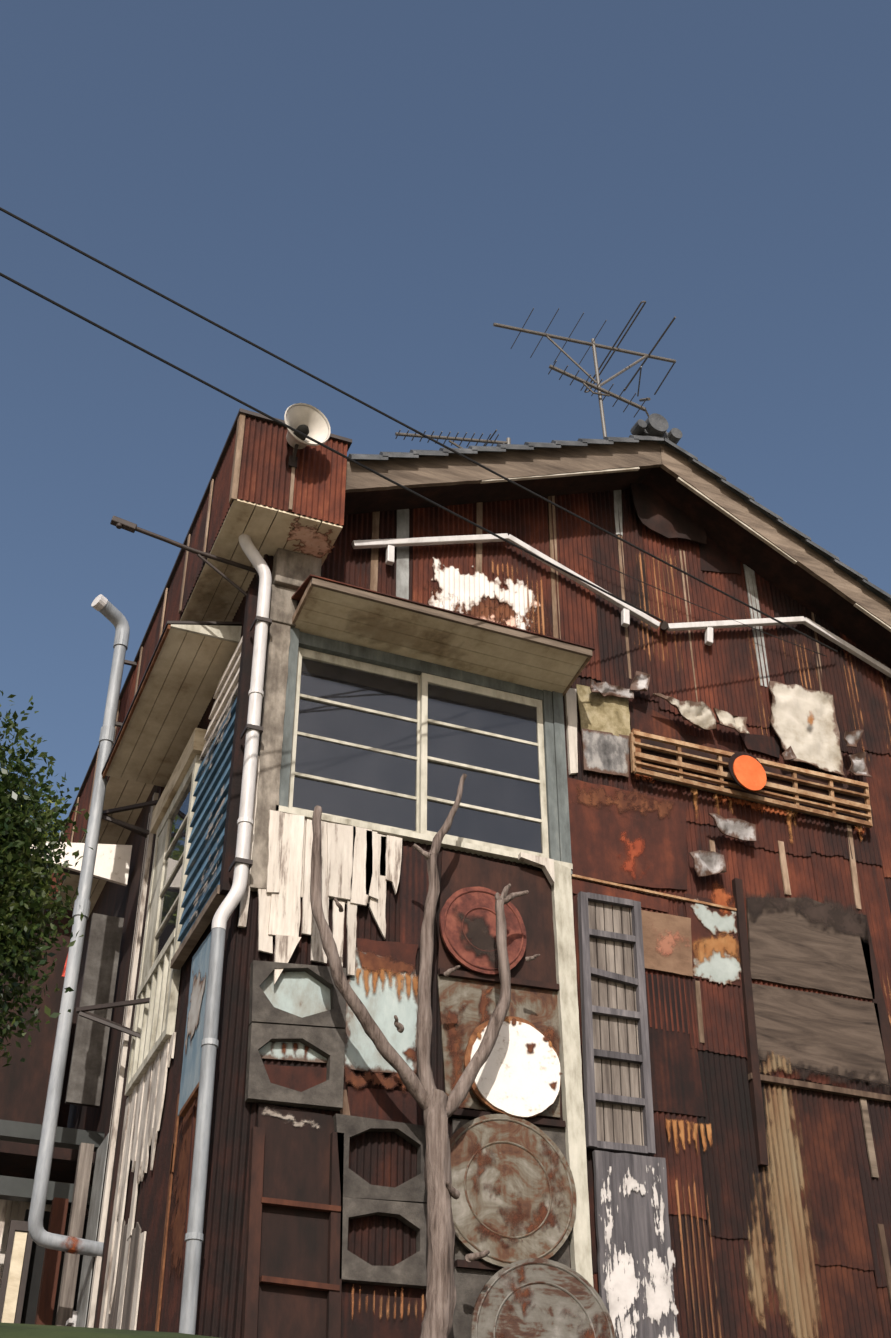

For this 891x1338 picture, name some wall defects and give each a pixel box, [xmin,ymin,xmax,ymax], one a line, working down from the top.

peeling [428,557,541,631]
rust [577,774,674,819]
rust [691,788,797,842]
rust [621,832,645,878]
rust [443,987,521,1105]
rust [526,1026,560,1053]
rust [473,1141,564,1248]
peeling [601,1163,680,1338]
rust [499,1265,531,1315]
rust [580,1315,609,1338]